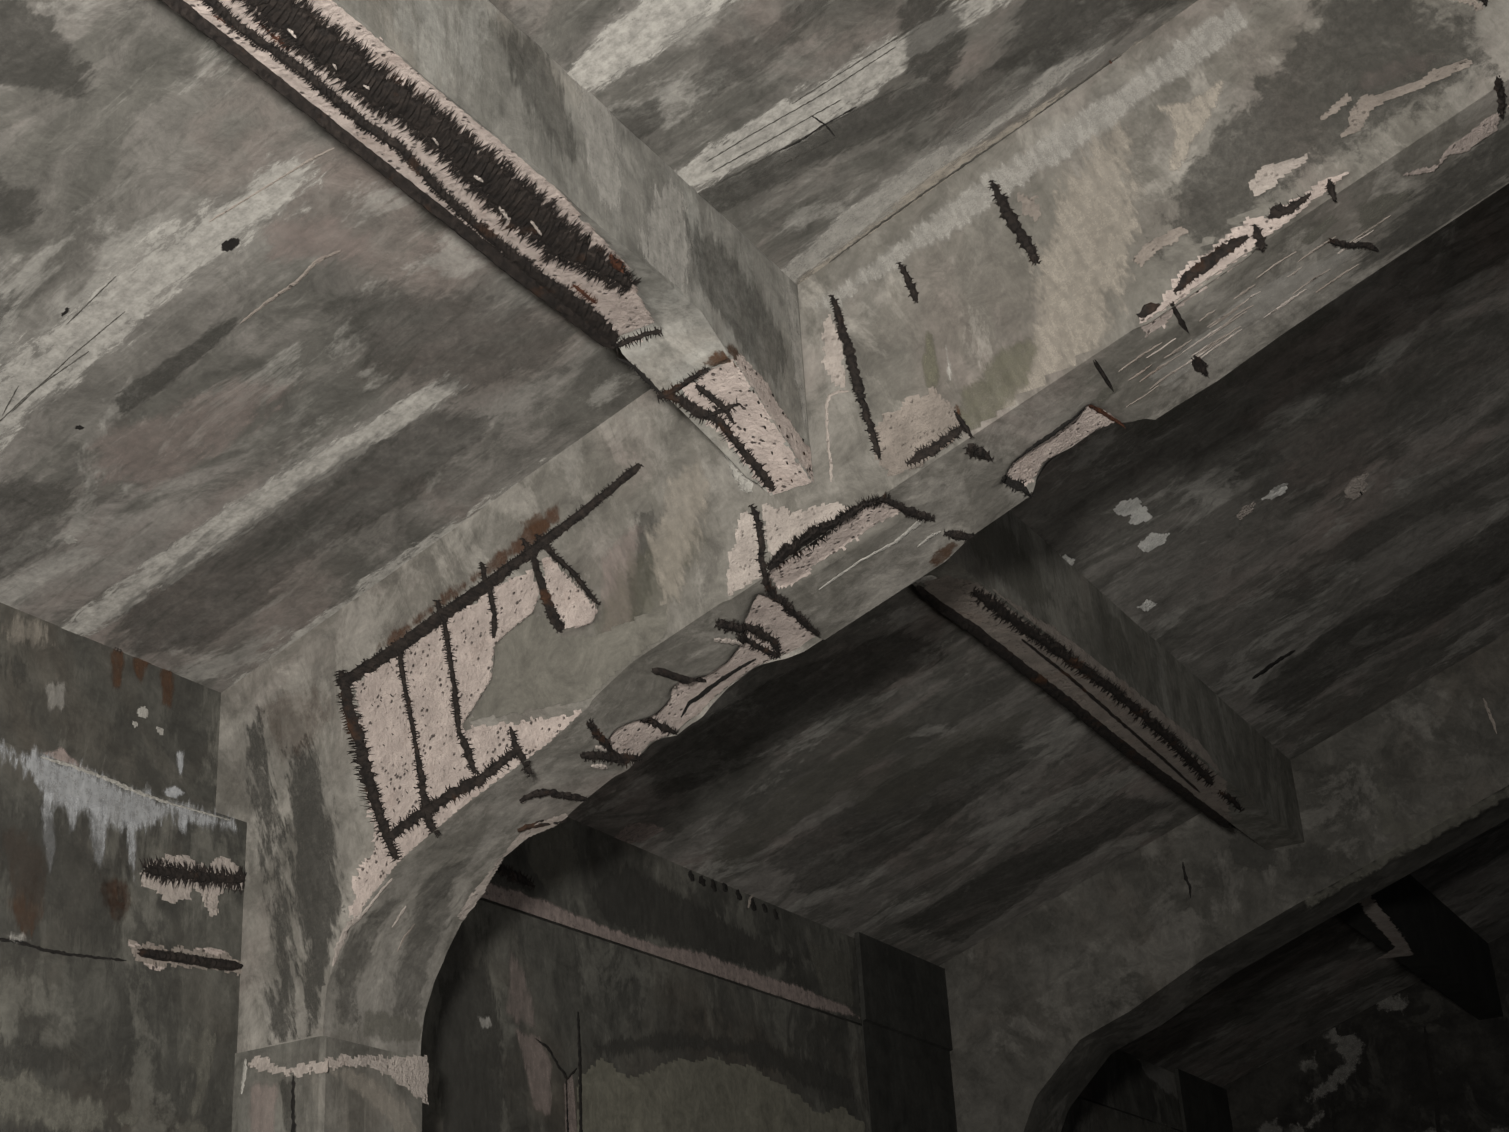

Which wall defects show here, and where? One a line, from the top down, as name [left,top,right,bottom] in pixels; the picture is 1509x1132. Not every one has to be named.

spalling [161,0,663,354]
spalling [1132,153,1349,338]
spalling [1328,238,1378,252]
spalling [1000,360,1126,500]
spalling [1191,355,1208,377]
spalling [332,294,994,966]
spalling [912,575,1244,828]
crack [0,935,127,961]
water stain [0,748,236,933]
spalling [128,939,243,976]
spalling [139,854,247,917]
spalling [241,1053,429,1105]